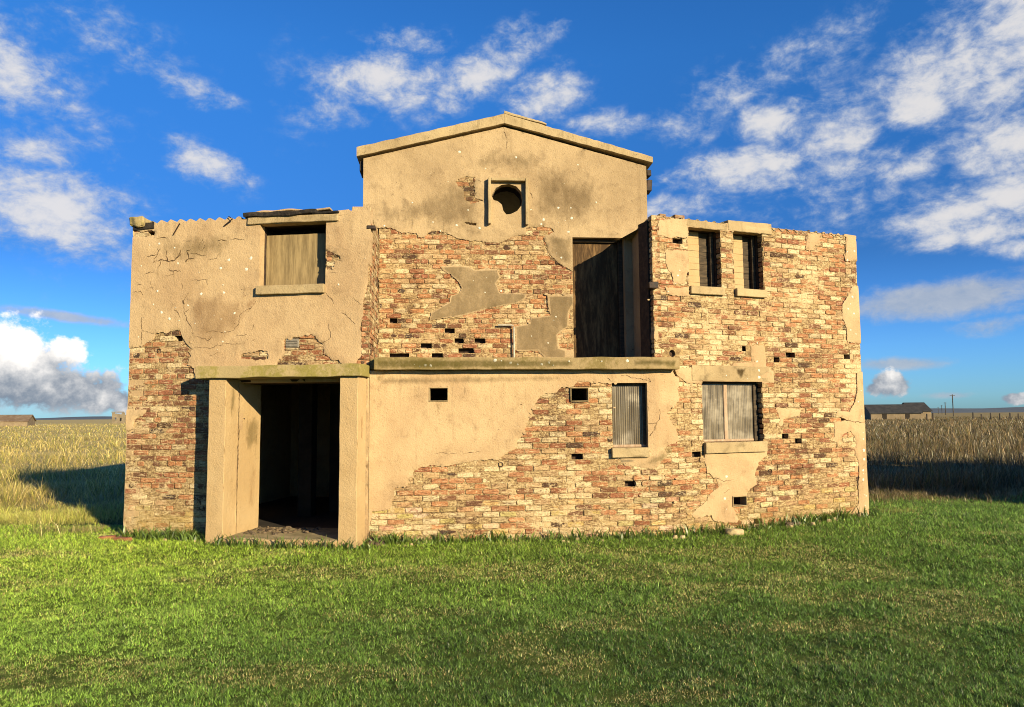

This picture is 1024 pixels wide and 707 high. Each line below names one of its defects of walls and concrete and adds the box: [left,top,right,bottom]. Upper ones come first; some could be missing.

spalling [456,177,481,204]
spalling [123,330,209,535]
crack [135,237,255,355]
spalling [241,333,342,365]
spalling [356,215,861,542]